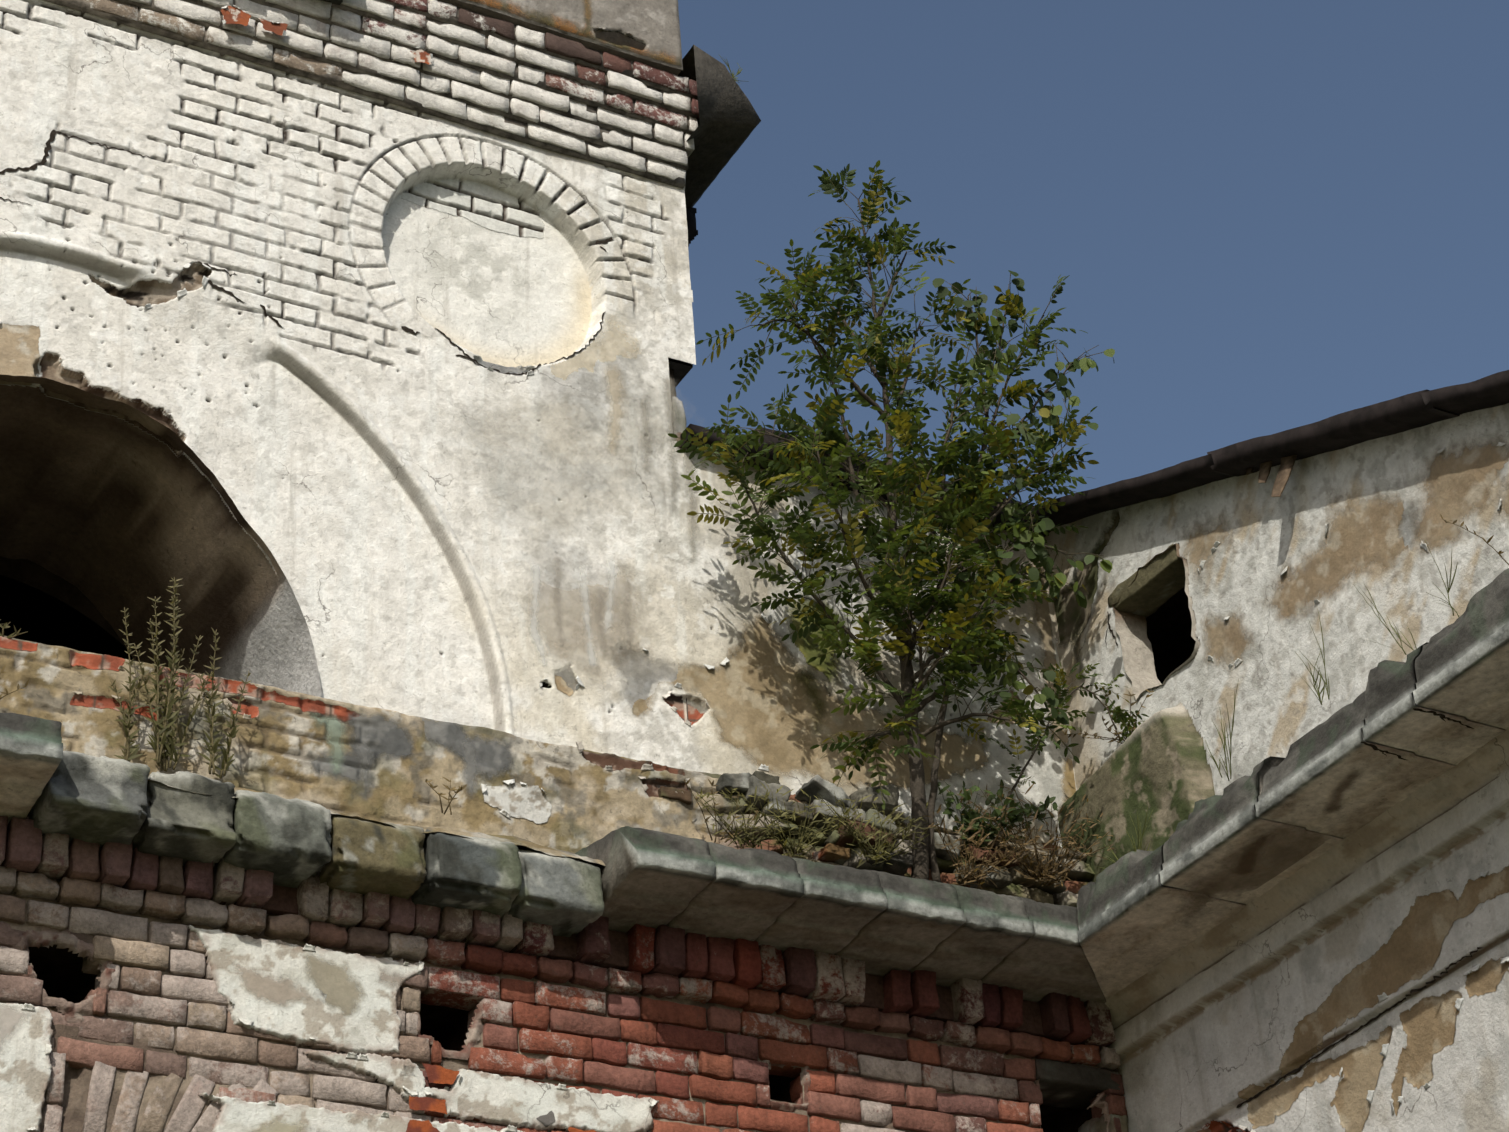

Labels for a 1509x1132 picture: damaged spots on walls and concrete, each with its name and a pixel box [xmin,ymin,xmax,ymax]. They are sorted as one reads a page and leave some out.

crack [0,130,150,205]
spalling [0,321,186,457]
spalling [89,261,285,329]
crack [401,312,605,375]
peeling [1184,523,1230,574]
peeling [1271,441,1509,618]
peeling [632,613,1026,789]
peeling [1205,615,1251,669]
peeling [481,779,552,824]
peeling [0,1003,54,1132]
peeling [188,925,659,1132]
peeling [1197,866,1509,1132]